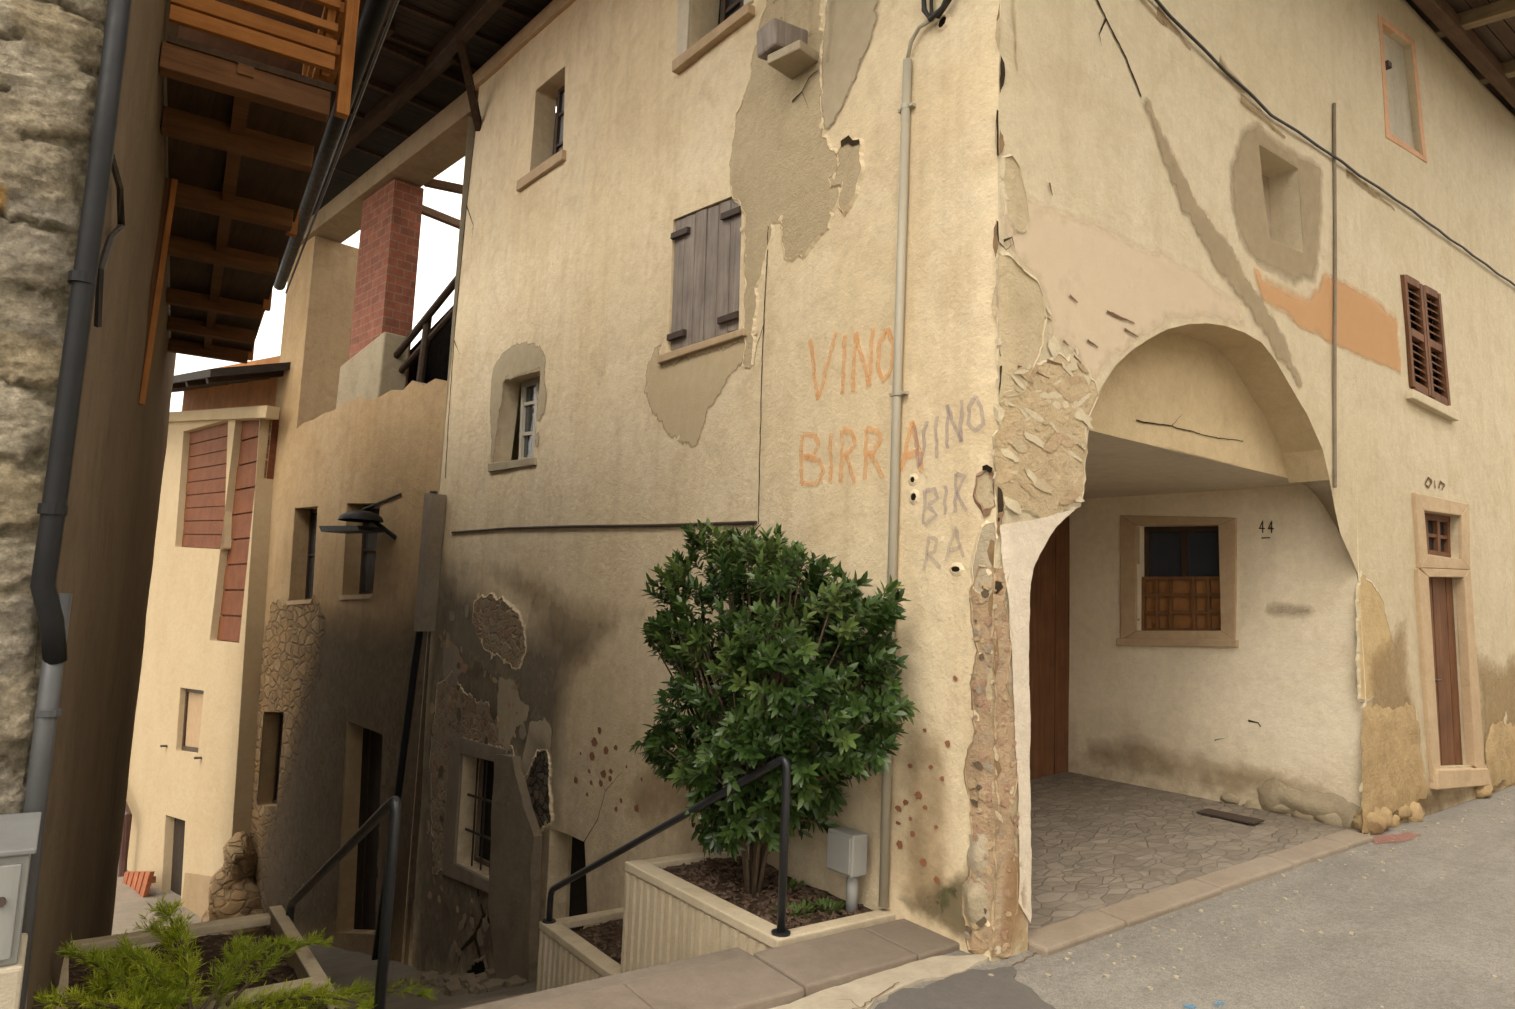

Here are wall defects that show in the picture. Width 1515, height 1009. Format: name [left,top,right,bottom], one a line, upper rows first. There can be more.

peeling [644,0,865,447]
spalling [995,4,1005,93]
damp [261,583,605,971]
spalling [427,592,555,975]
peeling [944,123,1099,959]
crack [1136,419,1243,442]
damp [1374,633,1410,710]
damp [1480,664,1515,736]